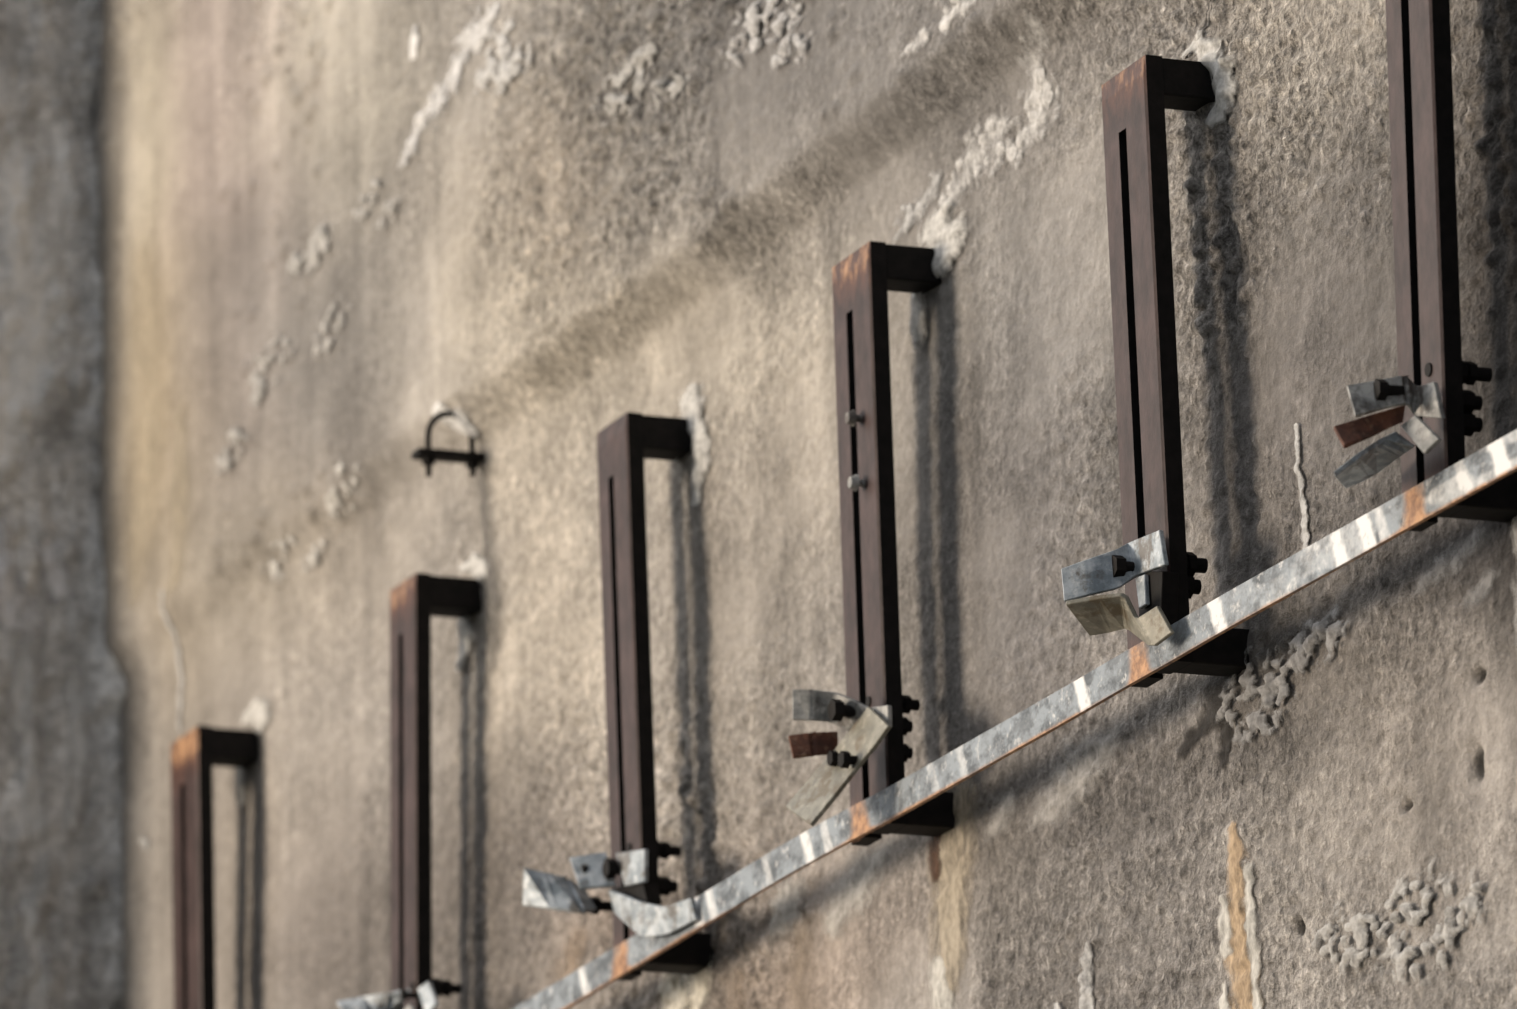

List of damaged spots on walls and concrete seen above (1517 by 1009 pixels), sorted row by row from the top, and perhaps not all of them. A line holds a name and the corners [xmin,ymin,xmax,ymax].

leakage [409,24,419,61]
spalling [1216,605,1349,744]
corrosion [928,835,941,882]
efflorescence [1078,942,1093,1009]
corrosion [1218,823,1261,1009]
spalling [1301,862,1482,985]